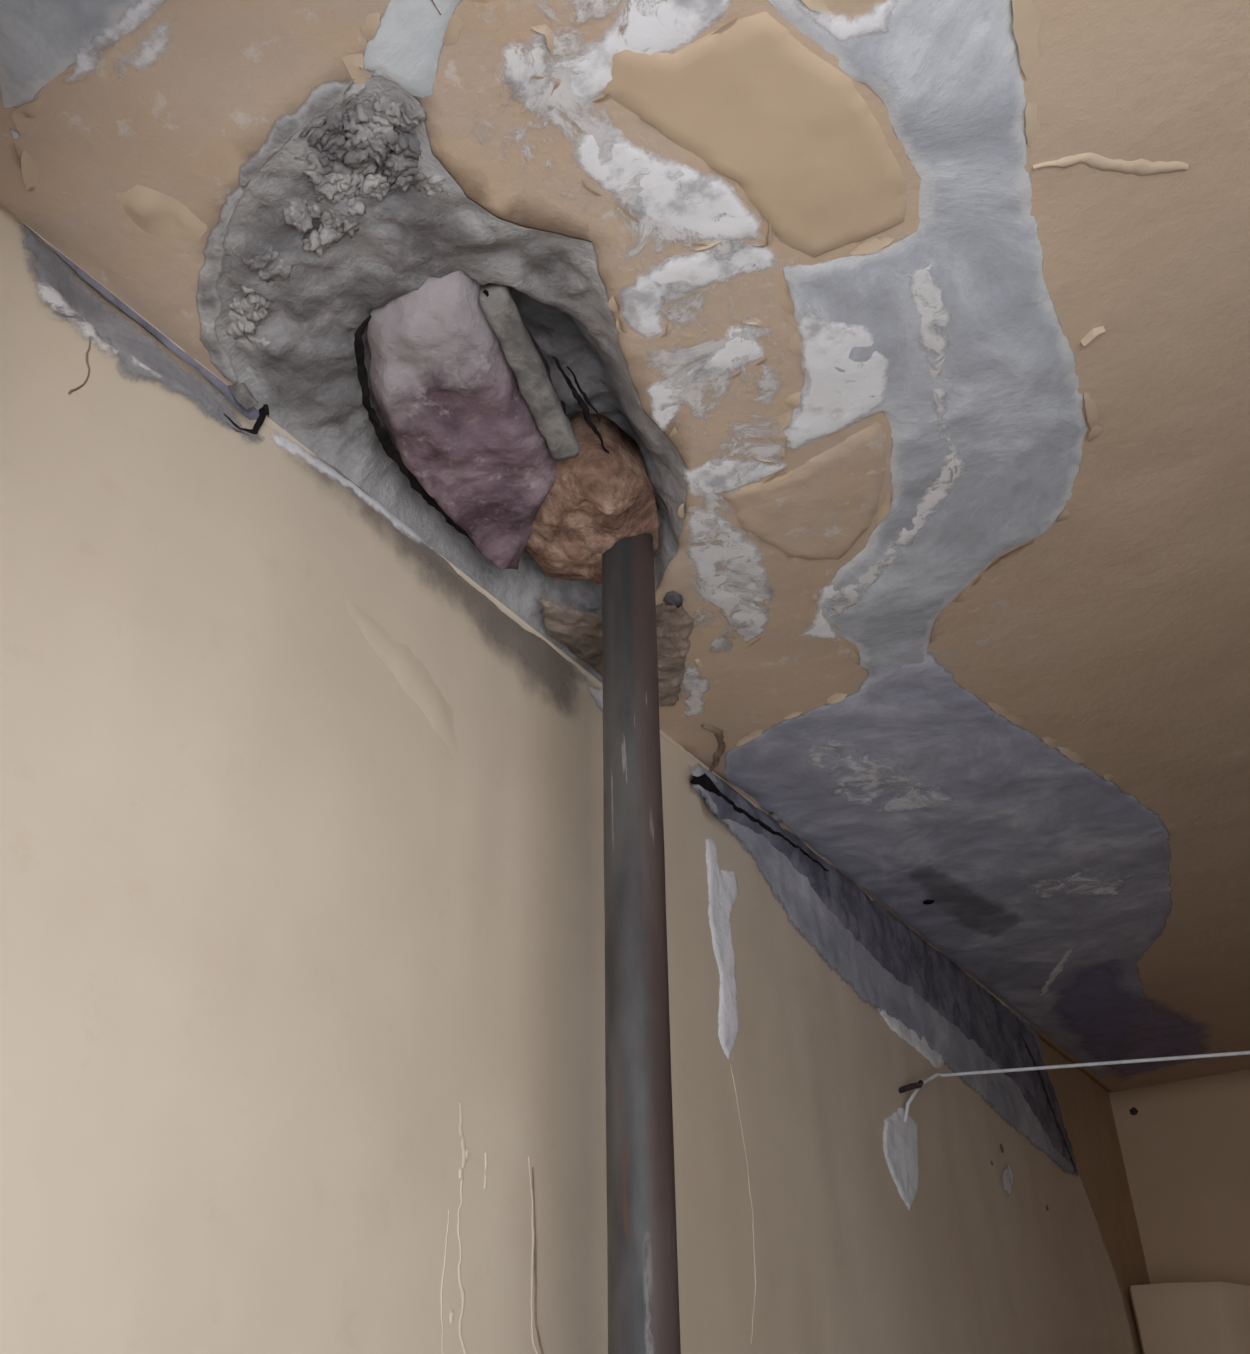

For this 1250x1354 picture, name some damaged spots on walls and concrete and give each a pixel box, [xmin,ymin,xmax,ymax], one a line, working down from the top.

spalling [0,0,787,683]
peeling [690,0,1179,1175]
spalling [656,591,715,717]
leakage [1057,966,1207,1077]
peeling [883,1107,919,1210]